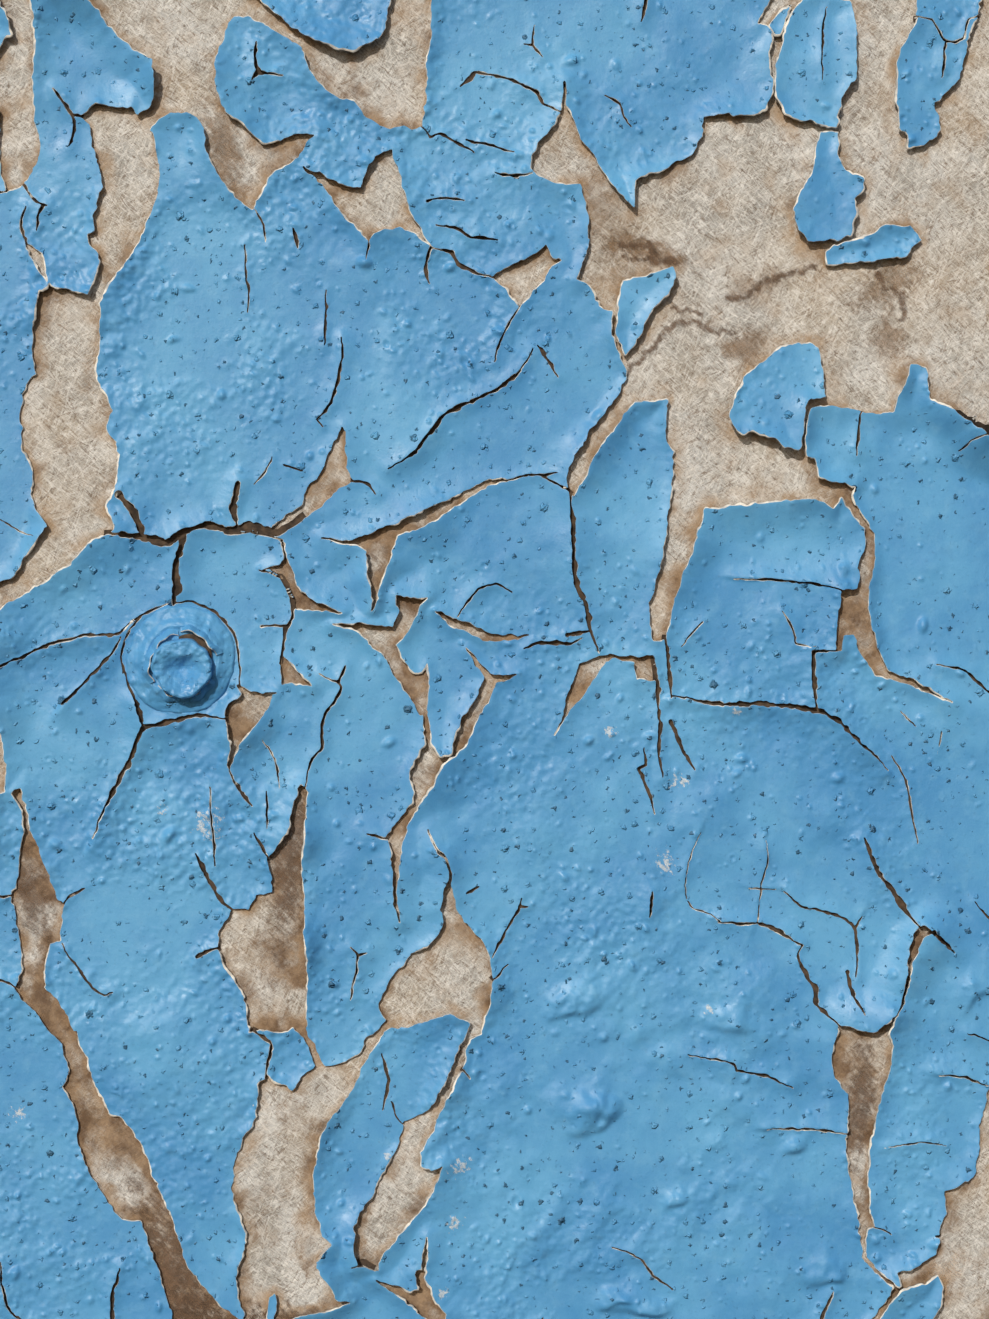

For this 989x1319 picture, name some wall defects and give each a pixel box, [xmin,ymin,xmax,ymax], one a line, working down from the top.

crack [0,458,306,833]
peeling [0,0,432,608]
peeling [0,736,493,1319]
peeling [225,657,311,785]
crack [195,665,346,911]
peeling [269,427,529,922]
crack [350,306,533,494]
crack [508,472,599,651]
peeling [531,0,989,726]
crack [684,832,864,1024]
crack [637,578,918,843]
peeling [832,924,989,1319]